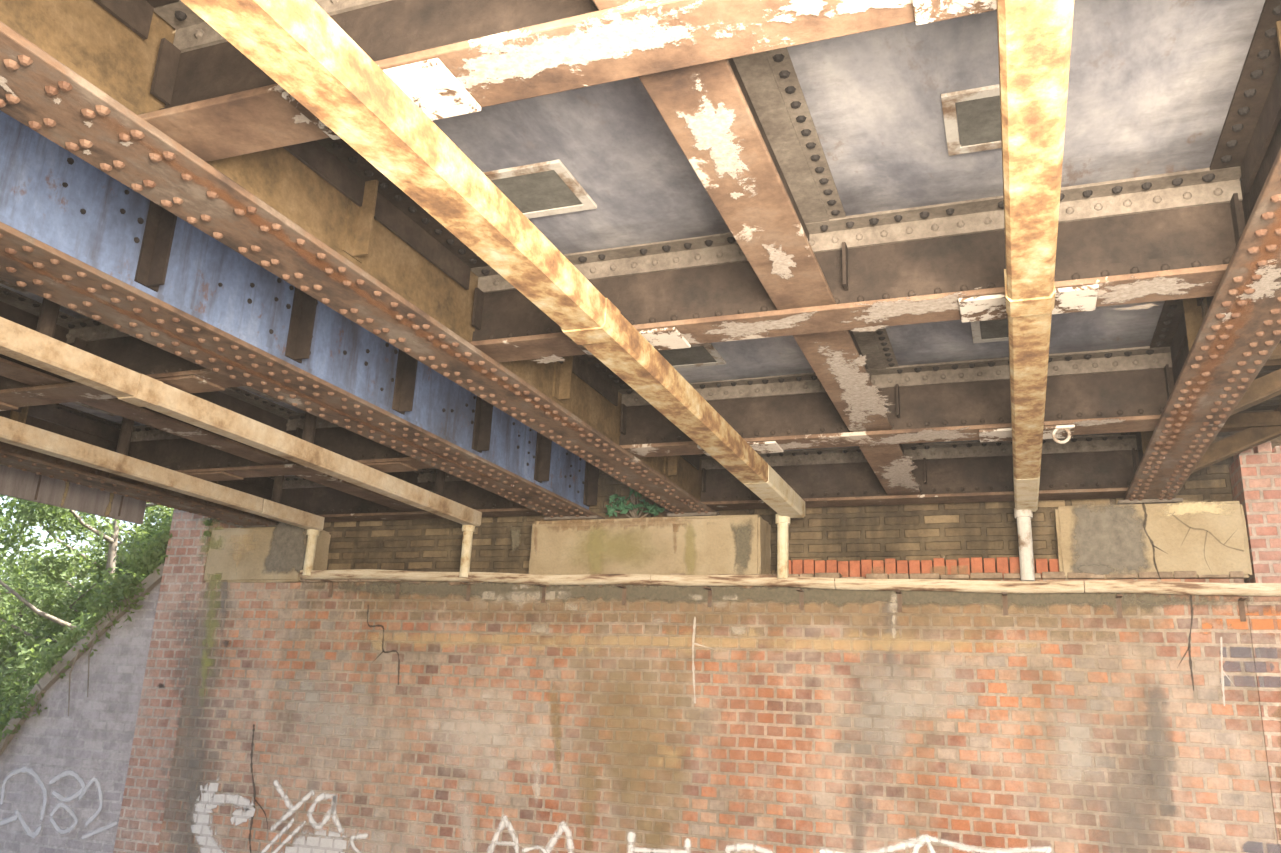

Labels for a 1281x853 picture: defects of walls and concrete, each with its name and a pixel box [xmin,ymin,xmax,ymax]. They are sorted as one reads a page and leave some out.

peeling [456,0,913,94]
peeling [676,74,756,199]
rust [189,173,578,430]
peeling [762,244,796,279]
peeling [842,287,981,332]
peeling [1097,275,1212,310]
peeling [1222,259,1281,323]
peeling [815,341,979,492]
crack [1142,503,1166,579]
crack [367,605,400,685]
crack [1177,595,1235,706]
crack [249,725,268,853]